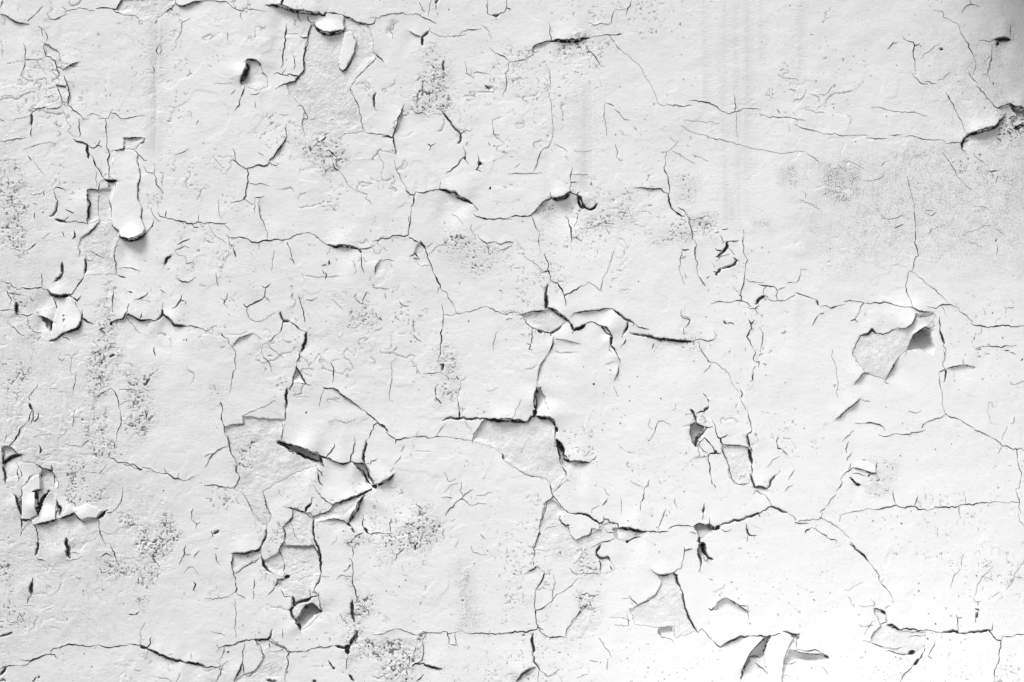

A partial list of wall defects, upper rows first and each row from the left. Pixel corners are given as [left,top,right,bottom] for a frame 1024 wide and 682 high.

spalling [287,17,376,140]
crack [0,0,1023,250]
peeling [0,137,162,341]
crack [3,386,39,446]
peeling [1,434,108,561]
spalling [205,416,393,631]
crack [83,48,819,681]
spalling [413,411,618,574]
crack [638,138,1023,524]
crack [0,612,226,682]
spalling [614,547,829,682]
crack [862,555,1024,679]